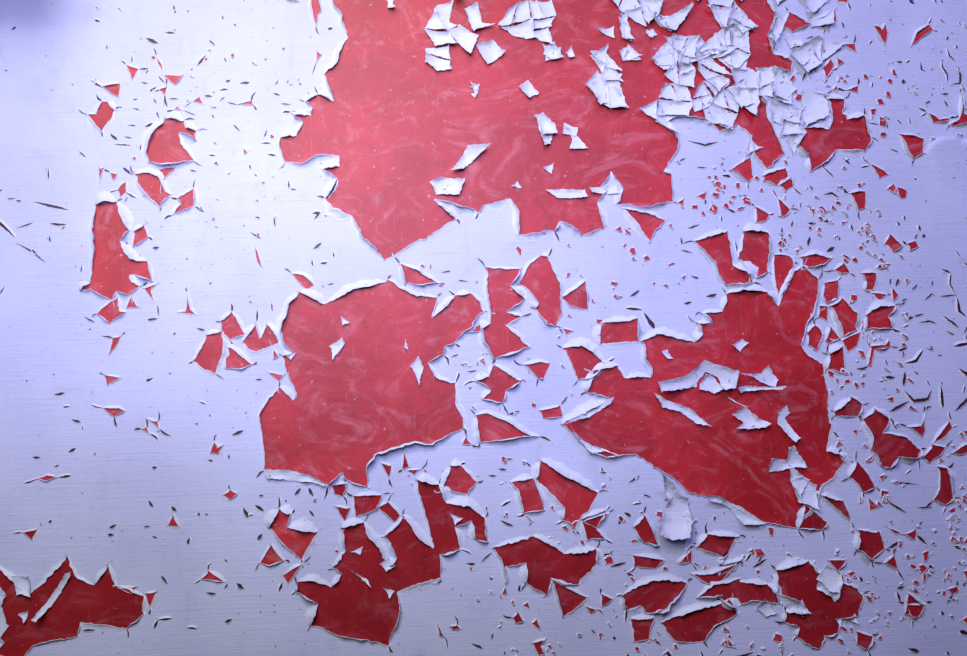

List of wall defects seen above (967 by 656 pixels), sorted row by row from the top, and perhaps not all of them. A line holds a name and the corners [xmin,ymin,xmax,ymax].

peeling [910,17,938,49]
peeling [898,51,967,166]
peeling [77,48,231,356]
peeling [690,166,737,217]
peeling [806,181,869,237]
peeling [884,233,919,259]
peeling [512,356,551,387]
peeling [91,403,126,428]
peeling [0,555,158,656]
peeling [255,543,290,572]
peeling [492,458,884,656]
peeling [898,540,937,628]